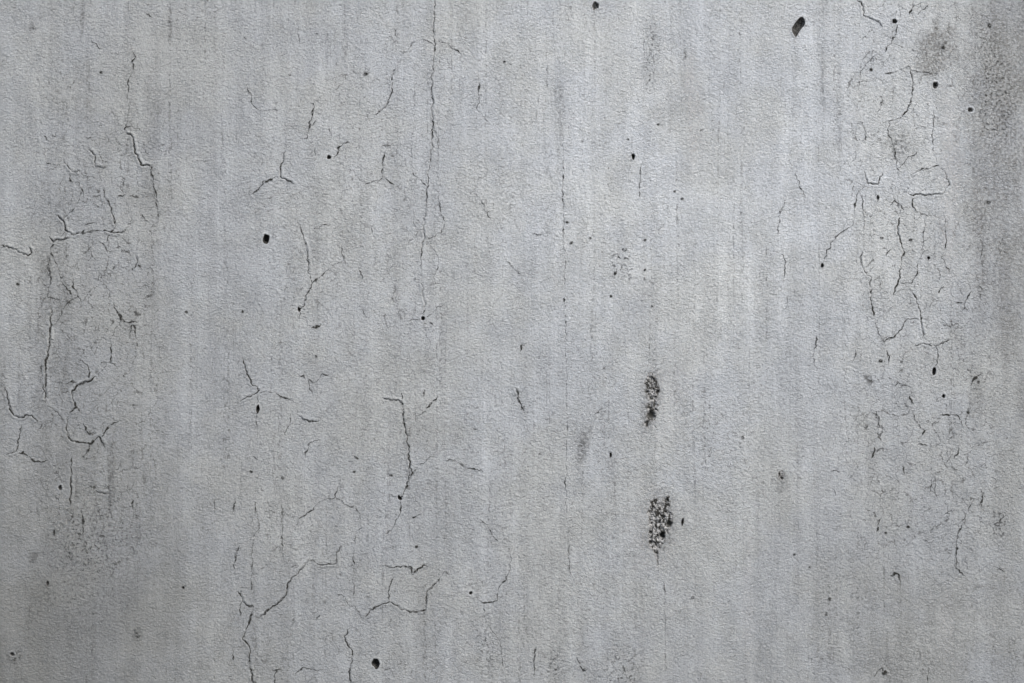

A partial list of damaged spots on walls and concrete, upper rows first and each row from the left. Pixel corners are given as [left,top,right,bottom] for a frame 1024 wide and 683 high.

crack [0,53,159,549]
crack [253,103,347,194]
crack [299,224,363,329]
crack [363,0,461,324]
crack [824,0,982,446]
crack [238,357,327,459]
crack [381,390,483,534]
crack [930,449,1006,577]
crack [214,491,448,683]